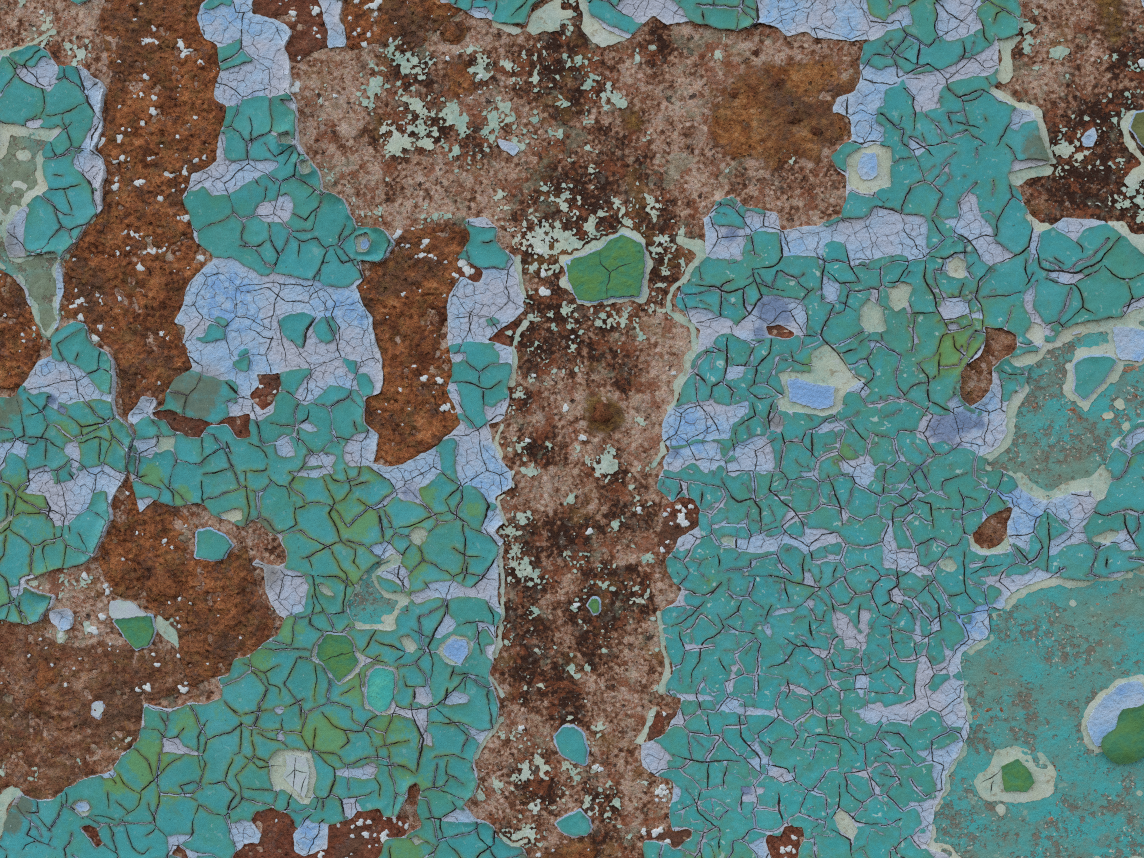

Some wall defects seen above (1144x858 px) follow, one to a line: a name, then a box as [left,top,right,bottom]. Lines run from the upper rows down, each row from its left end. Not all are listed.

rust [0,478,274,800]
rust [62,0,281,438]
crack [0,1,524,858]
peeling [0,0,530,858]
rust [358,226,483,466]
crack [600,262,630,294]
rust [659,497,699,554]
rust [709,48,858,170]
peeling [440,0,1144,858]
crack [650,0,1144,858]
rust [233,808,410,858]
rust [766,826,804,858]